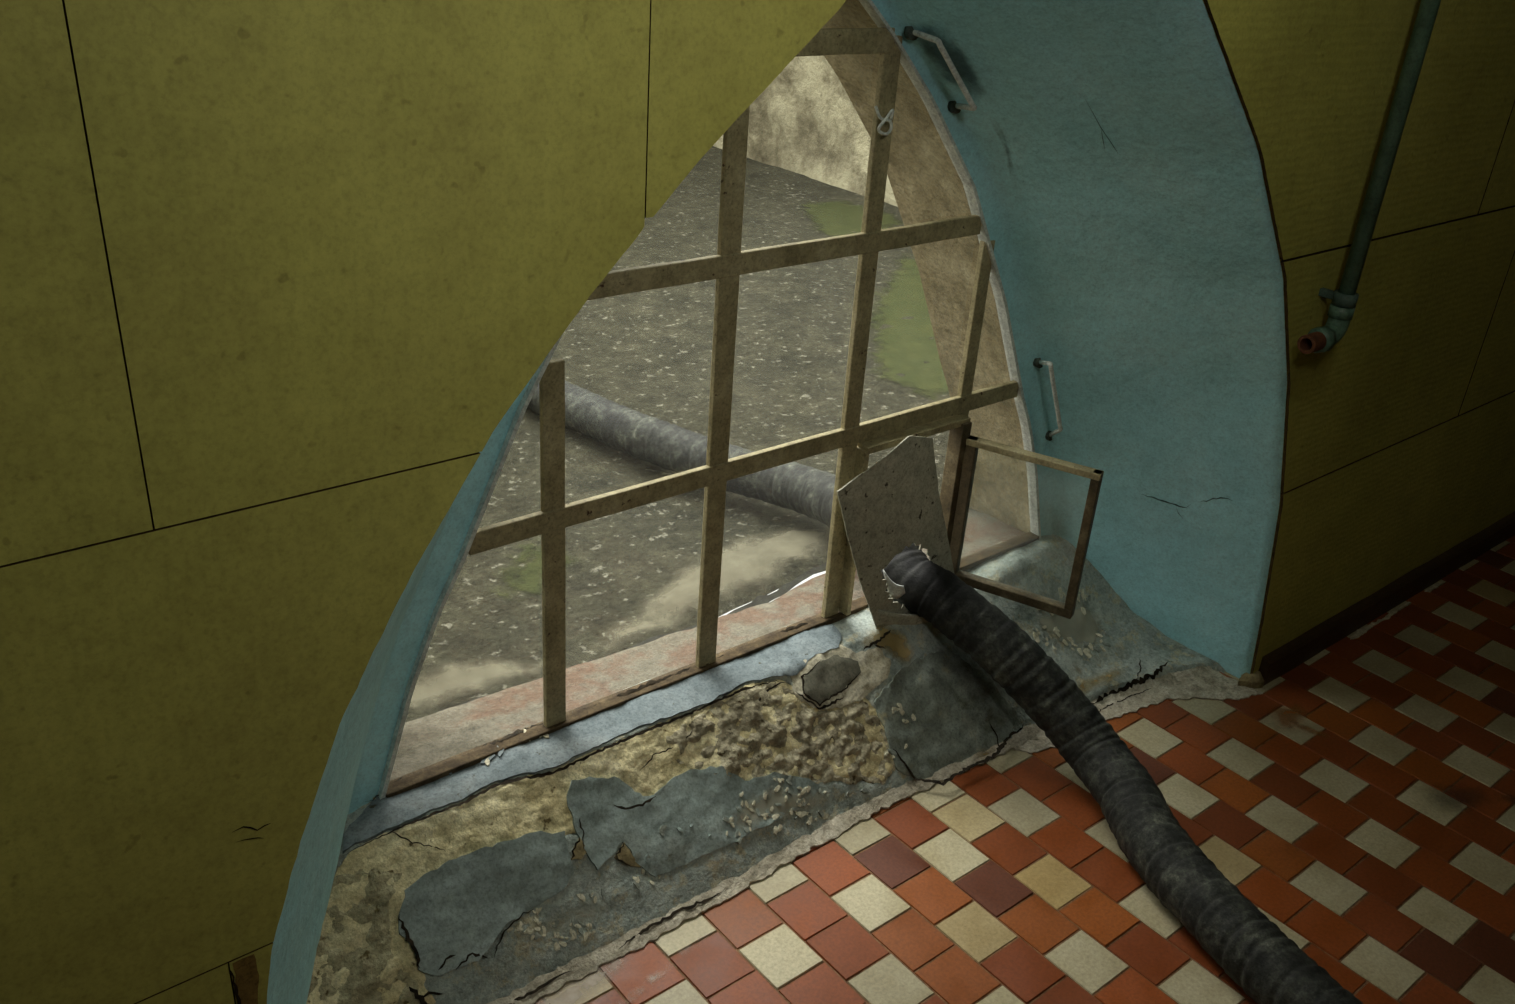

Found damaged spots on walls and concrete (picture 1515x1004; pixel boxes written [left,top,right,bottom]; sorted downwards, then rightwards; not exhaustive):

flaking render [306,623,1017,1004]
crack [1090,660,1172,704]